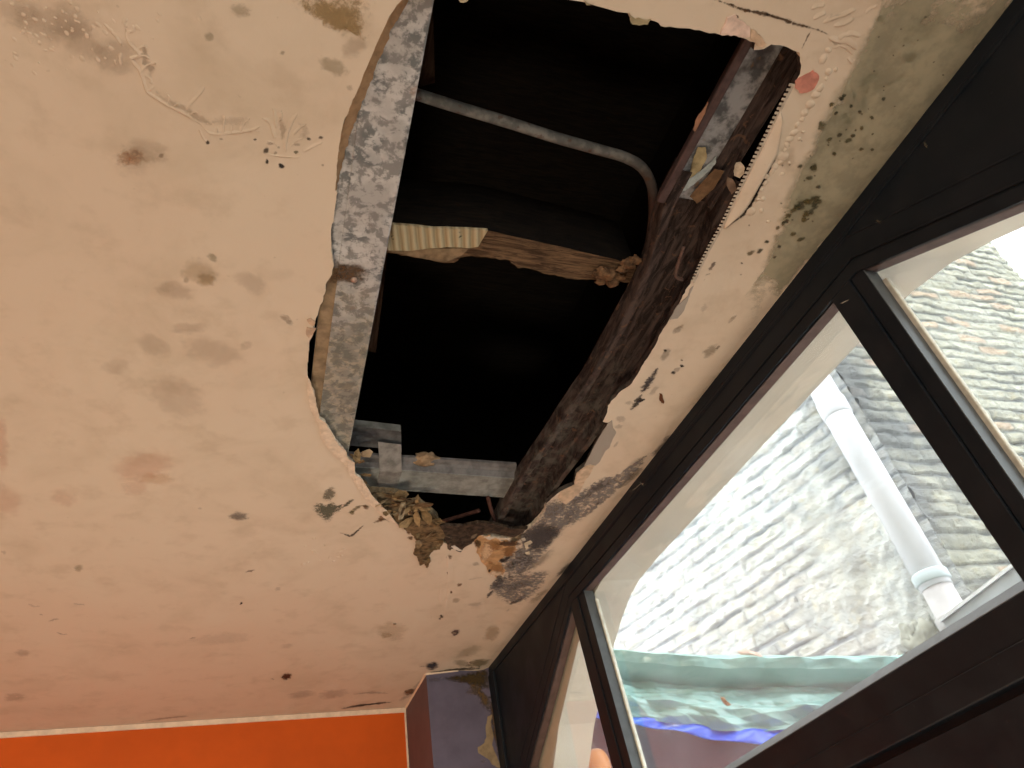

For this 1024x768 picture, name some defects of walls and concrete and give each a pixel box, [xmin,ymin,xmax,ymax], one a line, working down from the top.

leakage [303,0,361,35]
peeling [720,14,767,48]
crack [719,1,822,39]
spalling [335,0,408,191]
leakage [741,0,1013,290]
peeling [558,465,594,504]
leakage [315,489,368,520]
flaking render [349,448,532,577]
leakage [487,459,642,605]